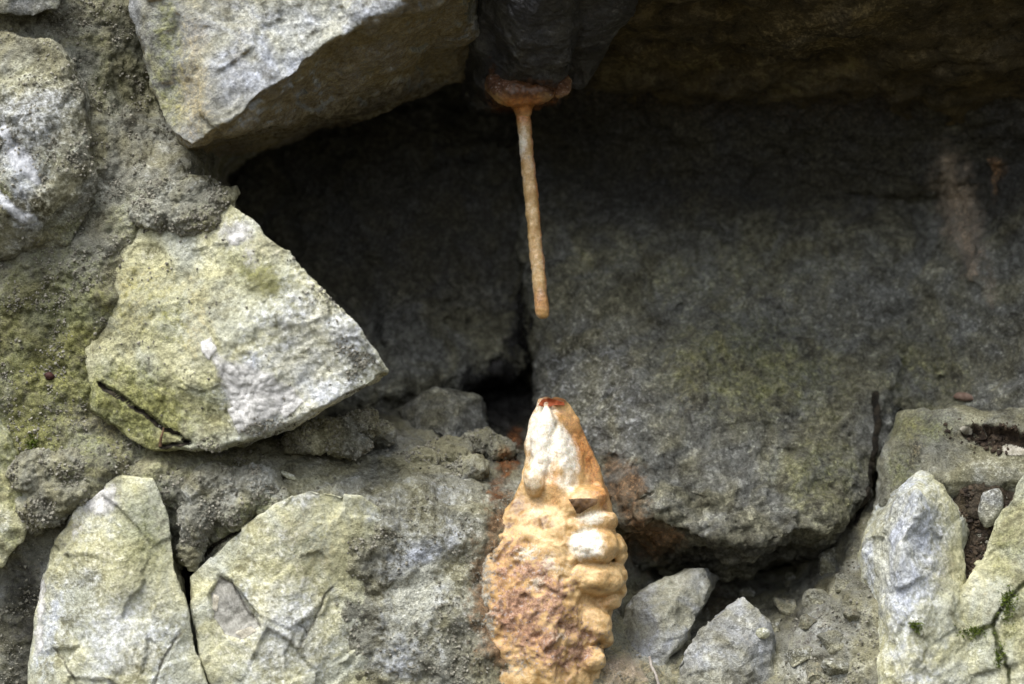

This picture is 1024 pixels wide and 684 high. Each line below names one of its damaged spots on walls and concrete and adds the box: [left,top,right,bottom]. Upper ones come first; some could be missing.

crack [98,382,190,450]